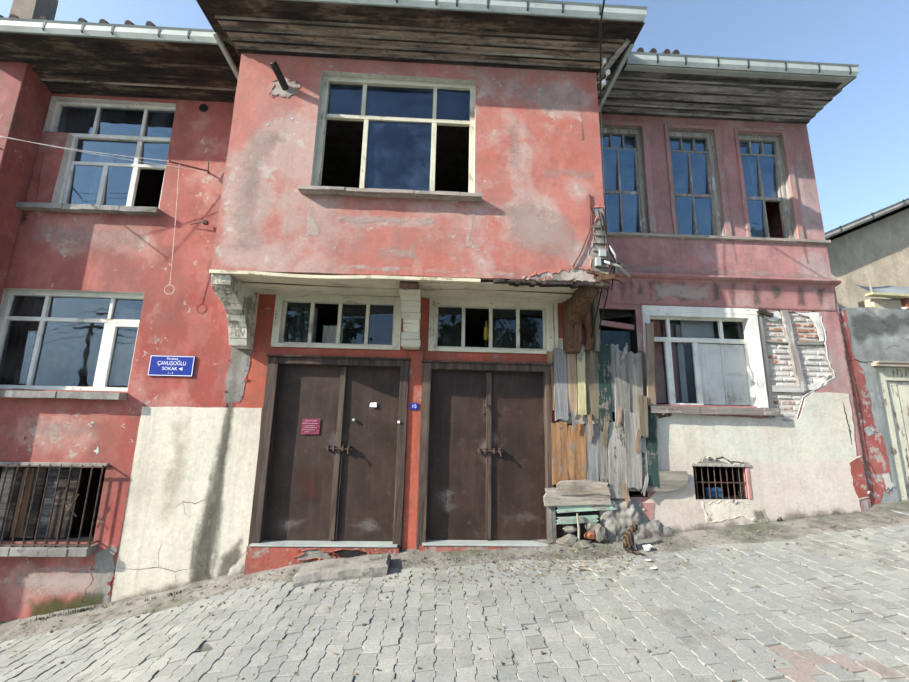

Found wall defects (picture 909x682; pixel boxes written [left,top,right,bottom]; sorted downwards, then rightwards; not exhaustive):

spalling [269,77,302,99]
spalling [522,205,628,283]
peeling [763,311,781,321]
peeling [221,344,254,407]
spalling [771,312,836,421]
leakage [125,404,240,599]
spalling [882,472,895,492]